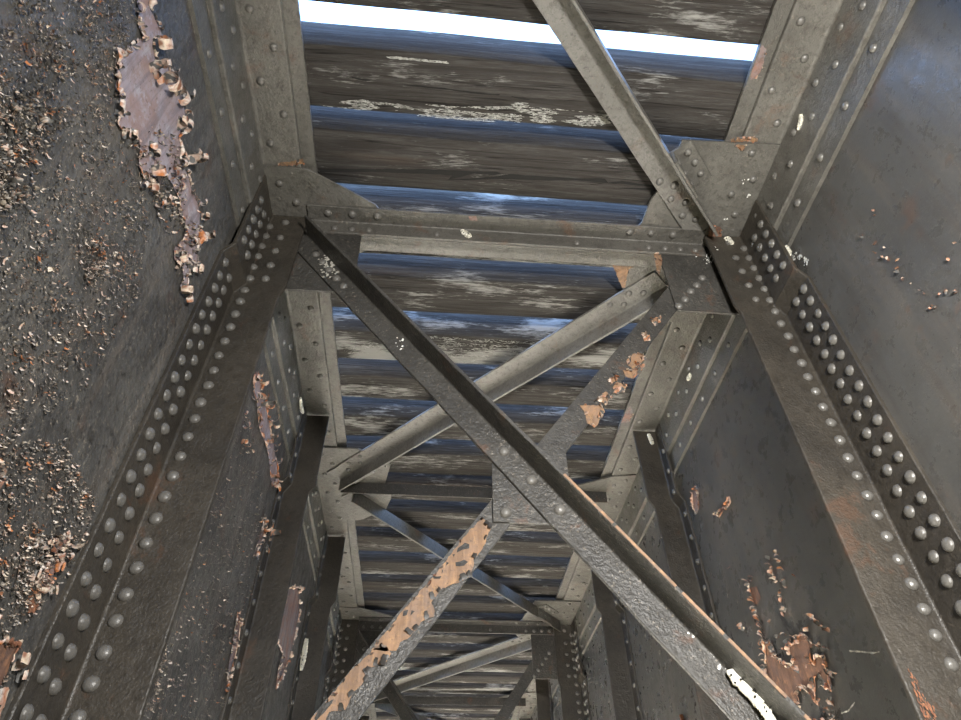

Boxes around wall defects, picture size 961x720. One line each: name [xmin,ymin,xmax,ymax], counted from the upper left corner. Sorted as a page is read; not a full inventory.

peeling [0,0,216,716]
rust [580,352,647,427]
rust [641,315,661,341]
peeling [143,371,283,719]
peeling [275,584,305,689]
rust [311,517,493,720]
peeling [742,549,837,716]